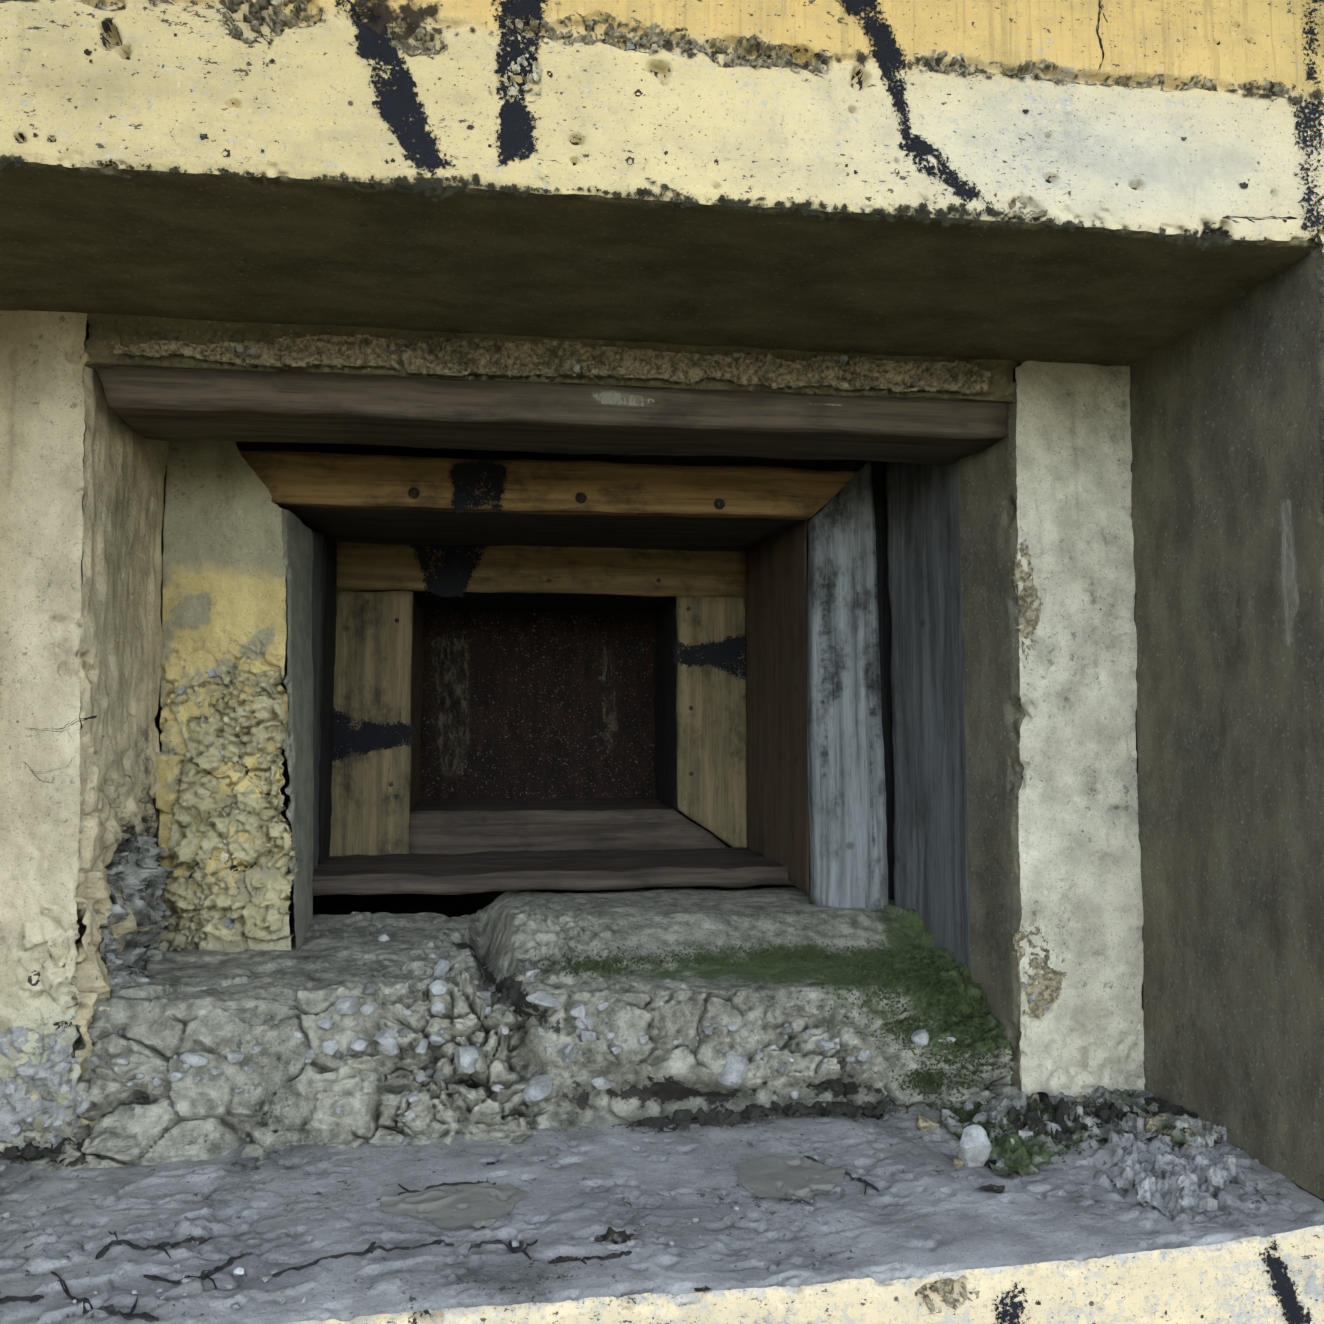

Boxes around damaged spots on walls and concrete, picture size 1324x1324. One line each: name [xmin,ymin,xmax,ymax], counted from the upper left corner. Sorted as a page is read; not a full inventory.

crack [1096,0,1108,75]
peeling [80,665,299,1001]
spalling [0,922,56,963]
spalling [0,1009,81,1148]
crack [0,1230,632,1322]